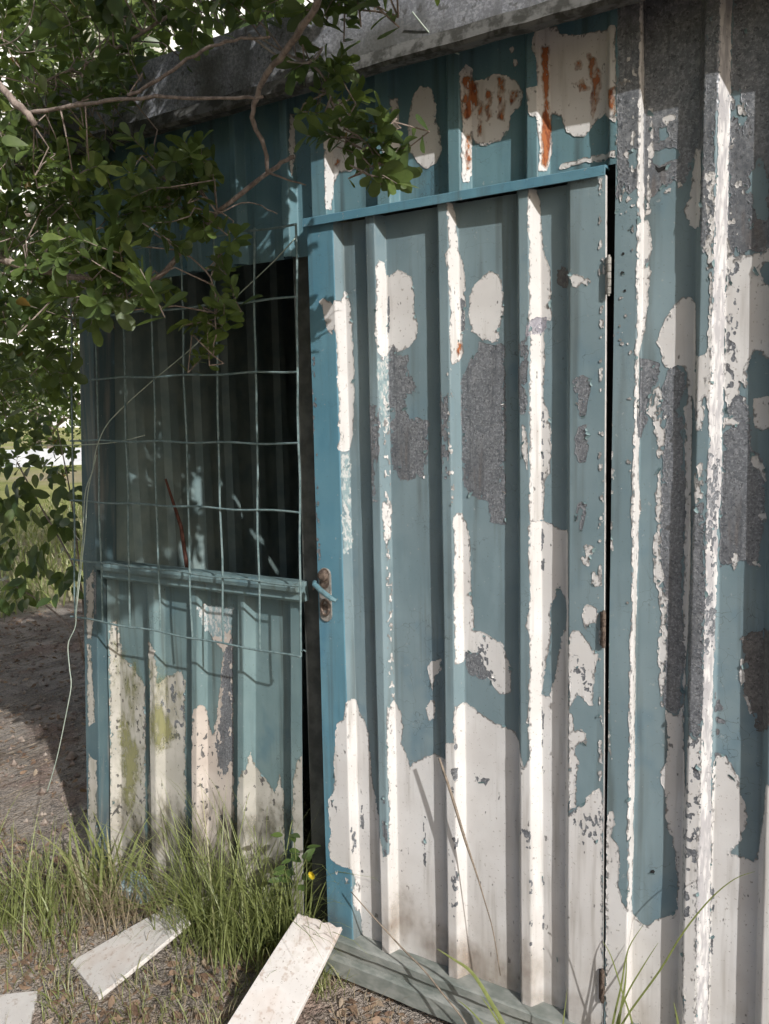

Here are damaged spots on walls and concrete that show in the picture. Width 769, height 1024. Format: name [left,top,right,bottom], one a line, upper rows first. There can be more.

corrosion [462,76,518,169]
corrosion [541,46,552,167]
corrosion [576,54,614,111]
peeling [319,291,355,554]
peeling [323,0,769,1024]
peeling [86,570,96,726]
peeling [88,603,304,916]